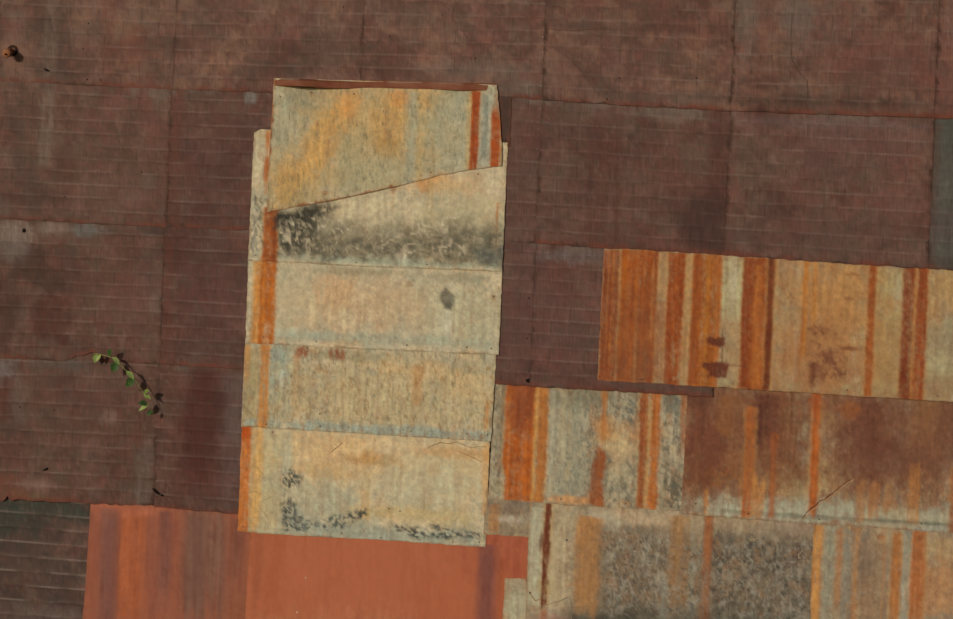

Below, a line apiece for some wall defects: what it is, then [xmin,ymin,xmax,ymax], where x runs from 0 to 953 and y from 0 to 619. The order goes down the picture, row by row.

rust [464,91,502,171]
rust [237,212,281,533]
rust [291,345,312,390]
rust [327,347,348,363]
rust [571,248,953,619]
mould [278,463,370,536]
rust [482,385,557,619]